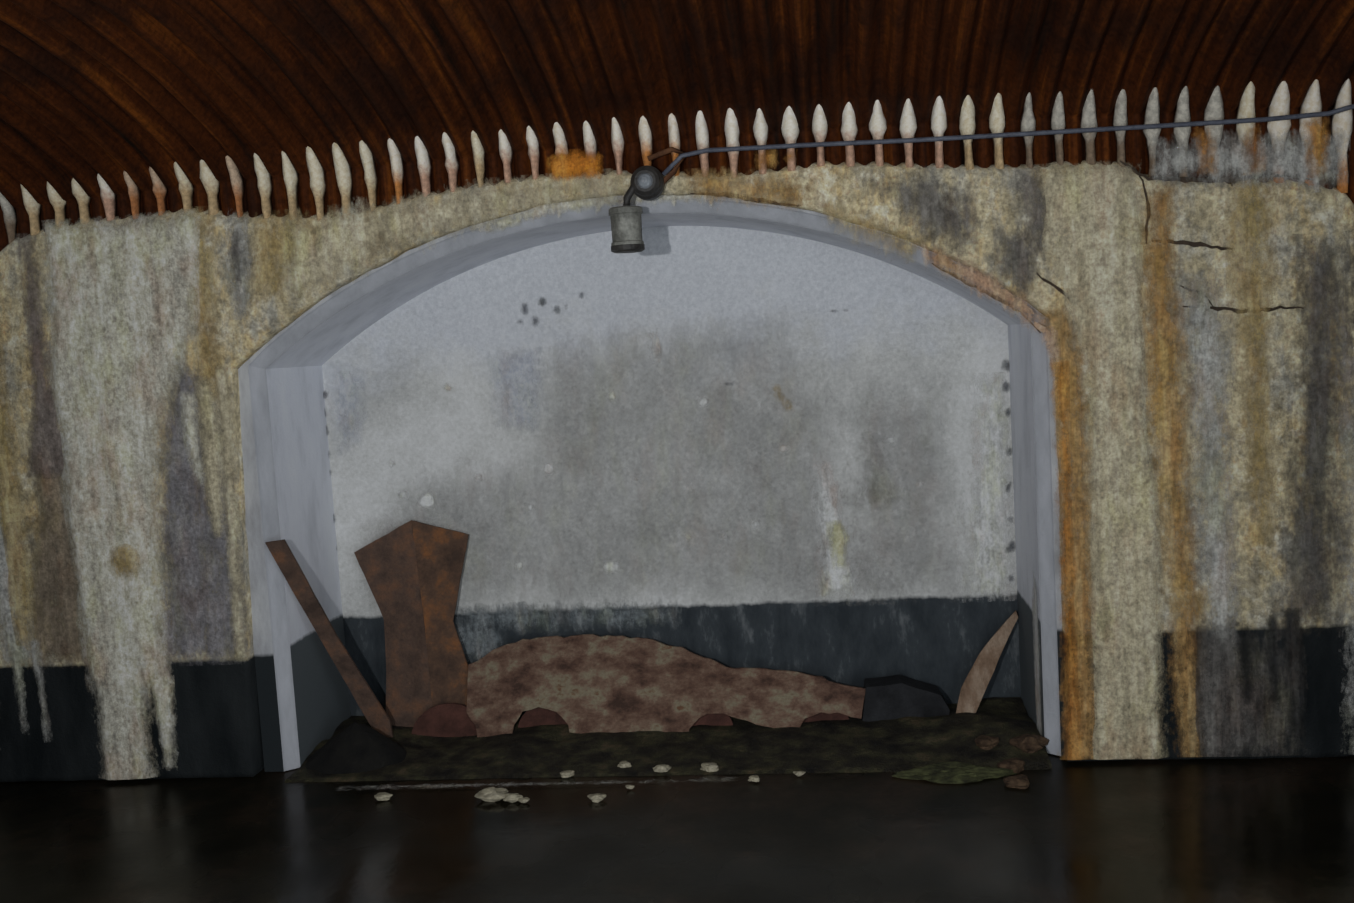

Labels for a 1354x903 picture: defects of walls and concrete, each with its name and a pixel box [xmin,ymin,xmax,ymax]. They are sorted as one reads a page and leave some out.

leakage [0,215,245,780]
leakage [896,180,977,244]
corrosion [1043,308,1095,760]
corrosion [1144,189,1200,757]
crack [1120,161,1310,250]
crack [1180,285,1304,314]
leakage [1182,243,1354,757]